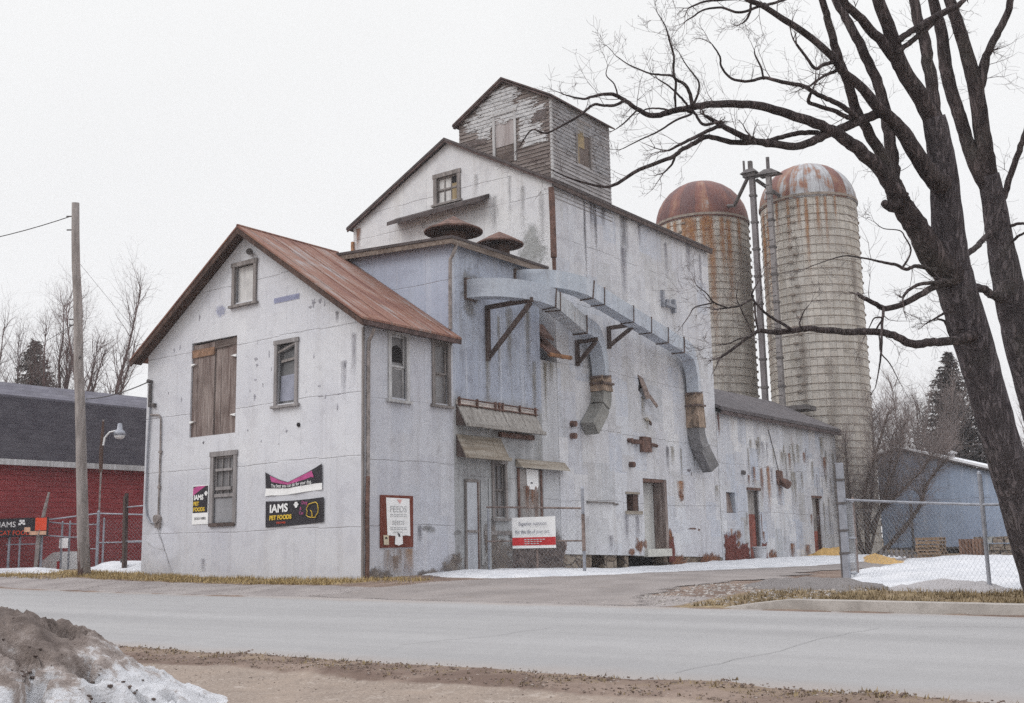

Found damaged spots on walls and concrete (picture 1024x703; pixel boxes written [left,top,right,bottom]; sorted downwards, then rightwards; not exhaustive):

peeling [462,84,610,177]
corrosion [762,196,836,293]
corrosion [748,438,795,490]
peeling [724,531,751,560]